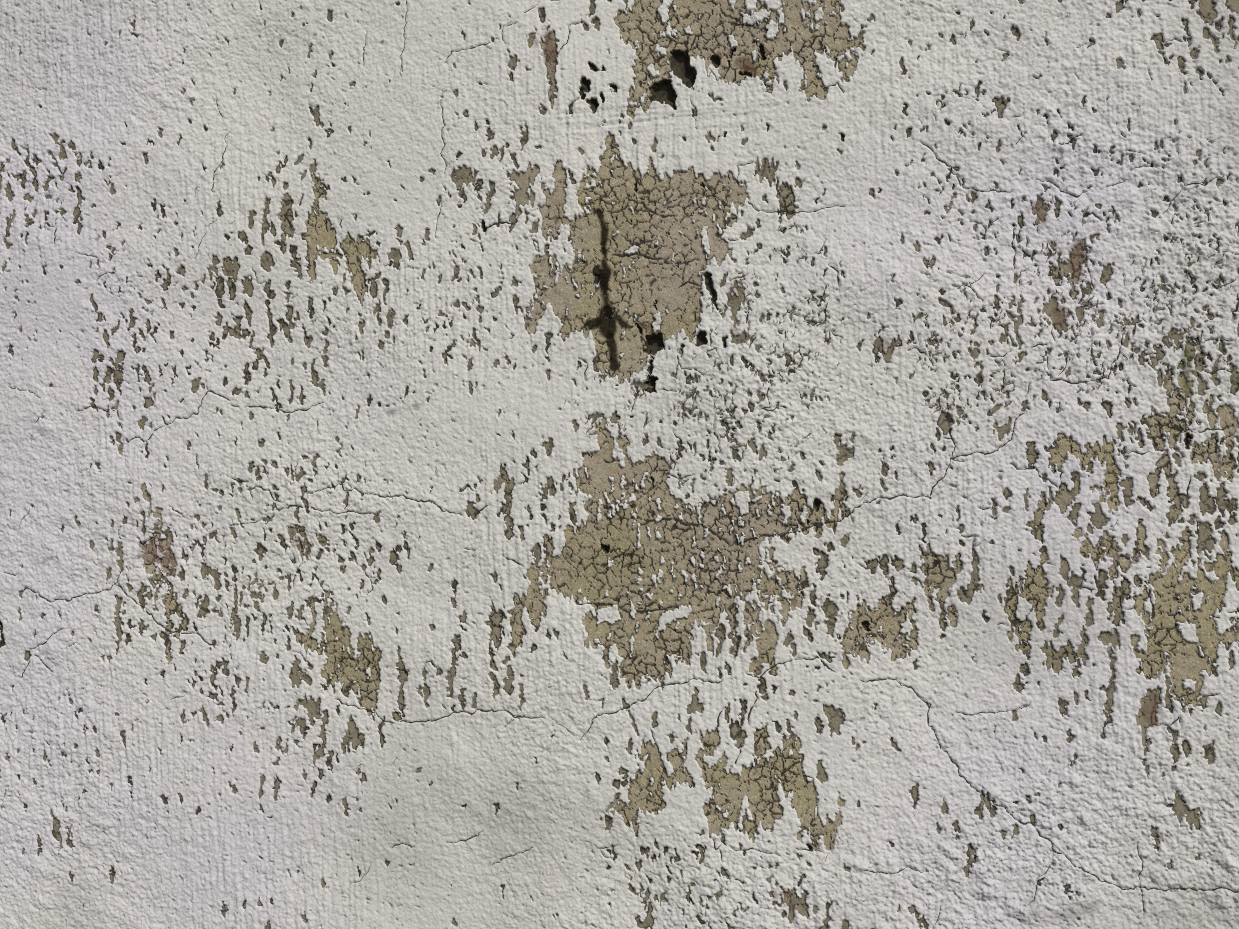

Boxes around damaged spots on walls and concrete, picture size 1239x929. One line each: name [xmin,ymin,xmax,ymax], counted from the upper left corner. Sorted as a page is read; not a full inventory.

peeling [1106,0,1145,18]
peeling [0,133,127,333]
leakage [586,209,629,371]
crack [250,484,461,516]
peeling [82,0,997,929]
peeling [856,81,1239,777]
crack [21,570,216,678]
peeling [0,694,100,809]
crack [337,656,833,739]
peeling [999,793,1040,840]
crack [861,679,1237,913]
peeling [1150,826,1160,851]